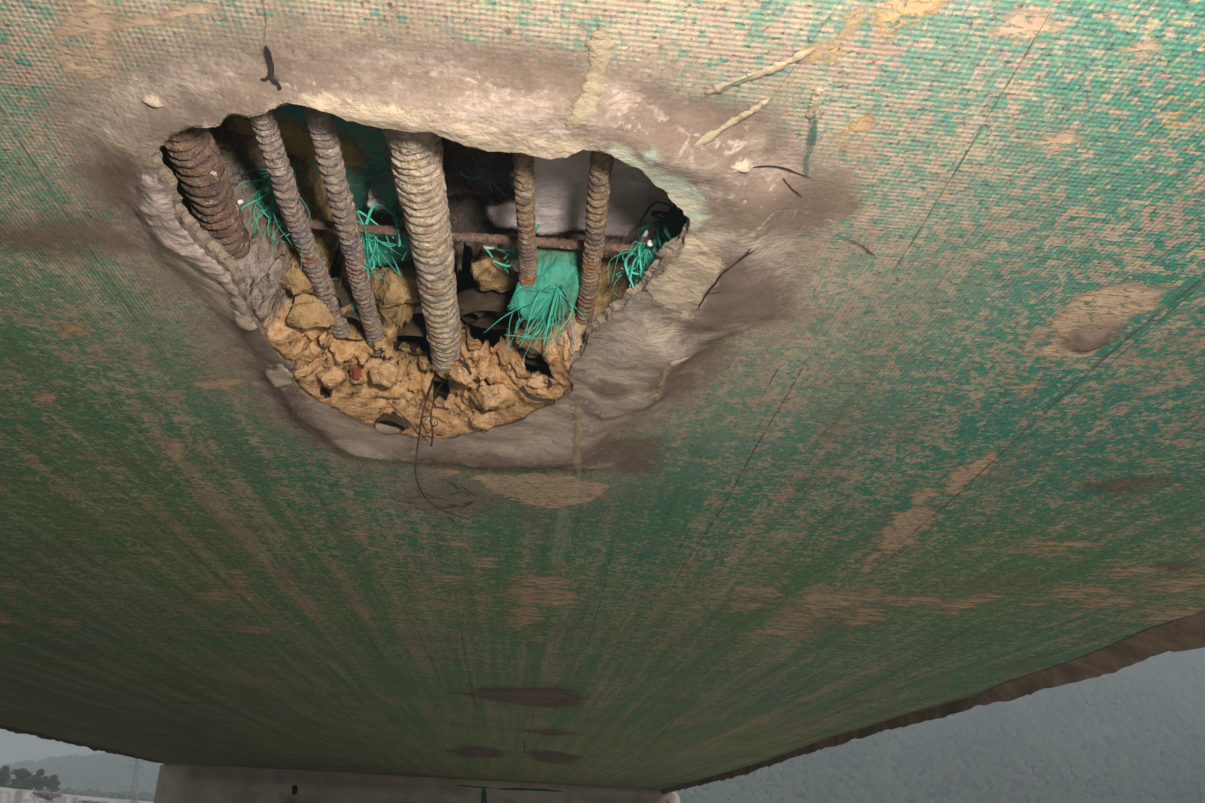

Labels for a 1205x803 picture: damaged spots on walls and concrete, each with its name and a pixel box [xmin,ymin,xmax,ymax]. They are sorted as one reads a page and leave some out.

damp [622,105,752,166]
damp [718,177,854,230]
spalling [133,91,726,442]
crack [697,246,760,310]
damp [685,252,781,333]
damp [650,350,710,400]